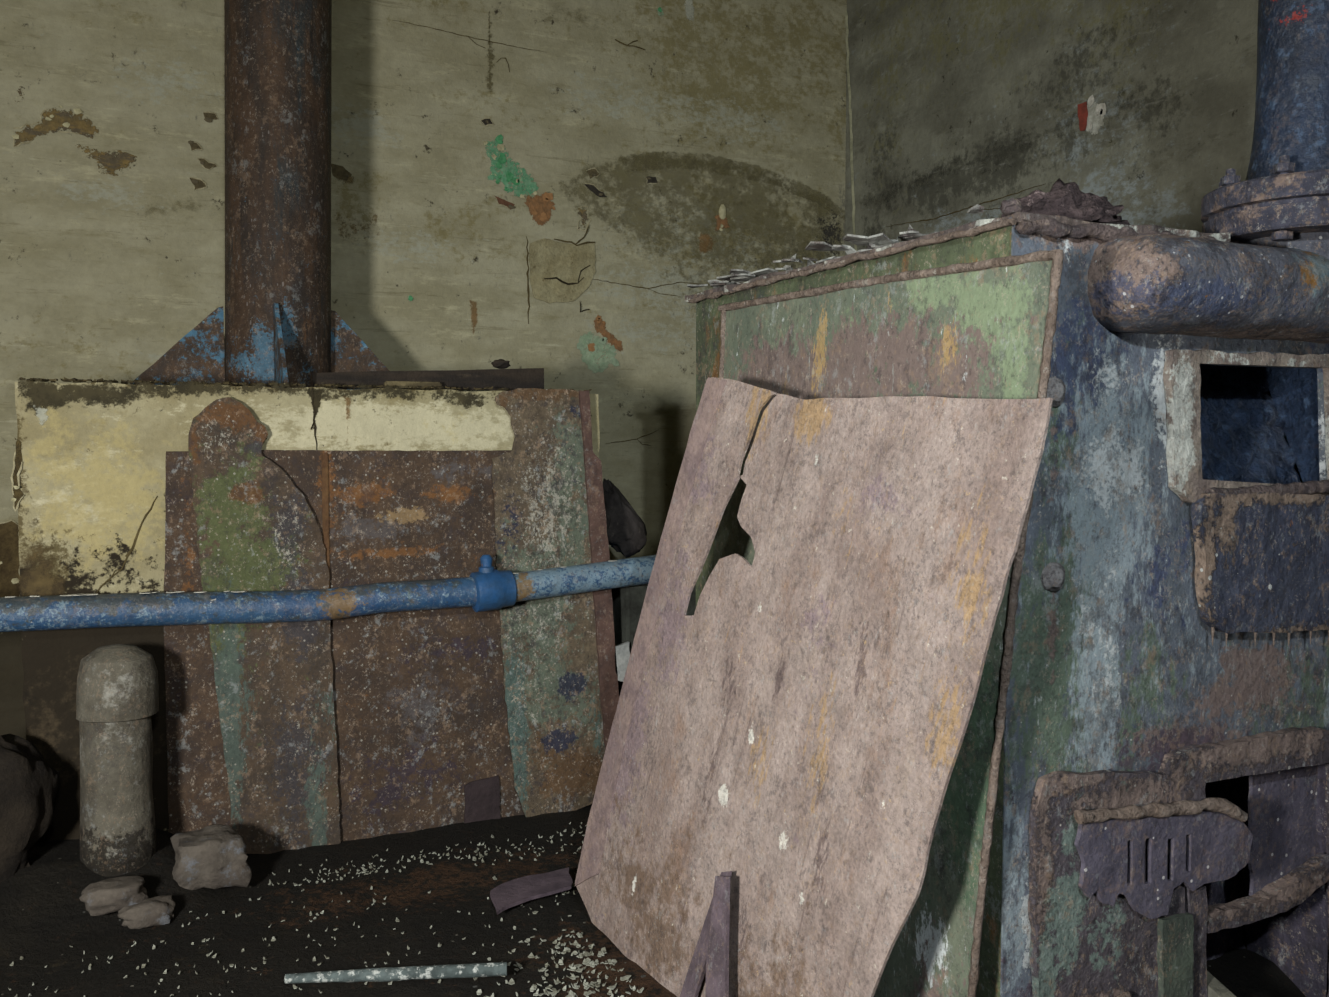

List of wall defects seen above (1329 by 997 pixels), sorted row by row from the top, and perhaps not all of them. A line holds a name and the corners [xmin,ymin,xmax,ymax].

spalling [12,105,137,176]
peeling [481,118,555,225]
water stain [812,210,841,257]
crack [526,226,698,324]
peeling [577,315,623,373]